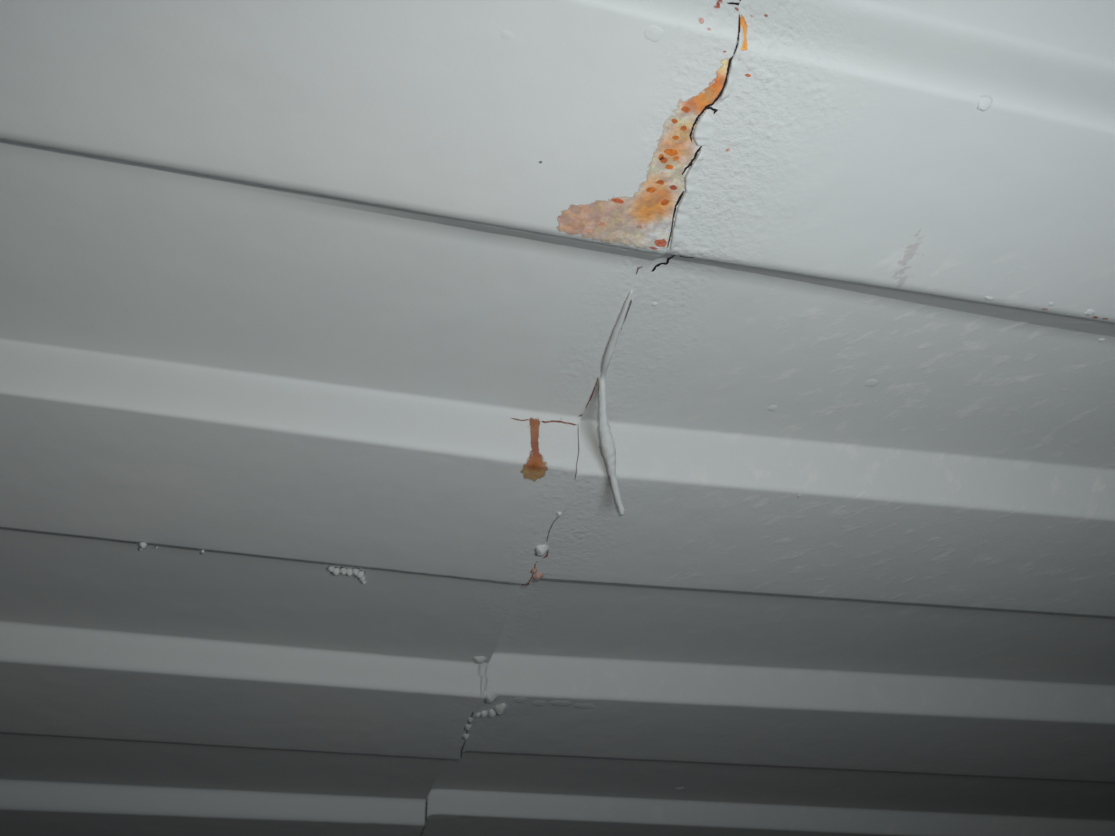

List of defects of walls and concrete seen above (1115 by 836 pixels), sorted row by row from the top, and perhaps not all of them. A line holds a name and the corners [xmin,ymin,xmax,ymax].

rust [558,7,748,250]
crack [621,0,744,330]
rust [512,418,576,481]
crack [575,378,598,479]
crack [523,517,559,585]